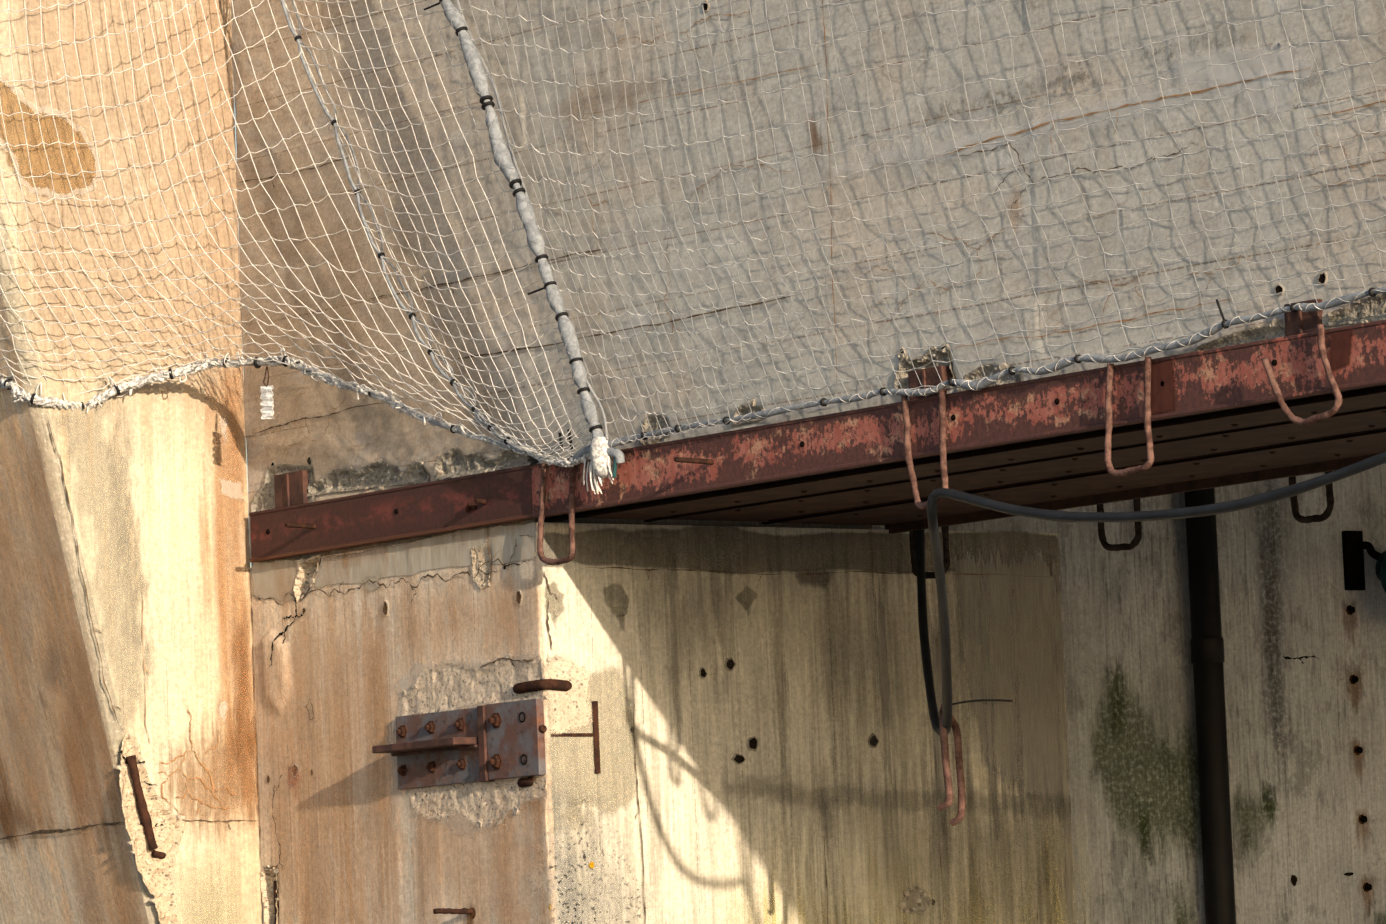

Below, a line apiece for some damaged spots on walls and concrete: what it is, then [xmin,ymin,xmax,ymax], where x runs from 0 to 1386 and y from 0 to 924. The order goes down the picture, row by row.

crack [439,0,1311,391]
crack [364,188,611,335]
crack [250,393,379,456]
rust [1151,360,1175,415]
rust [1330,330,1352,370]
spalling [293,554,321,612]
spalling [470,540,506,590]
crack [0,414,558,871]
spalling [401,653,590,733]
water stain [931,631,942,715]
spalling [115,731,185,924]
spalling [410,778,547,828]